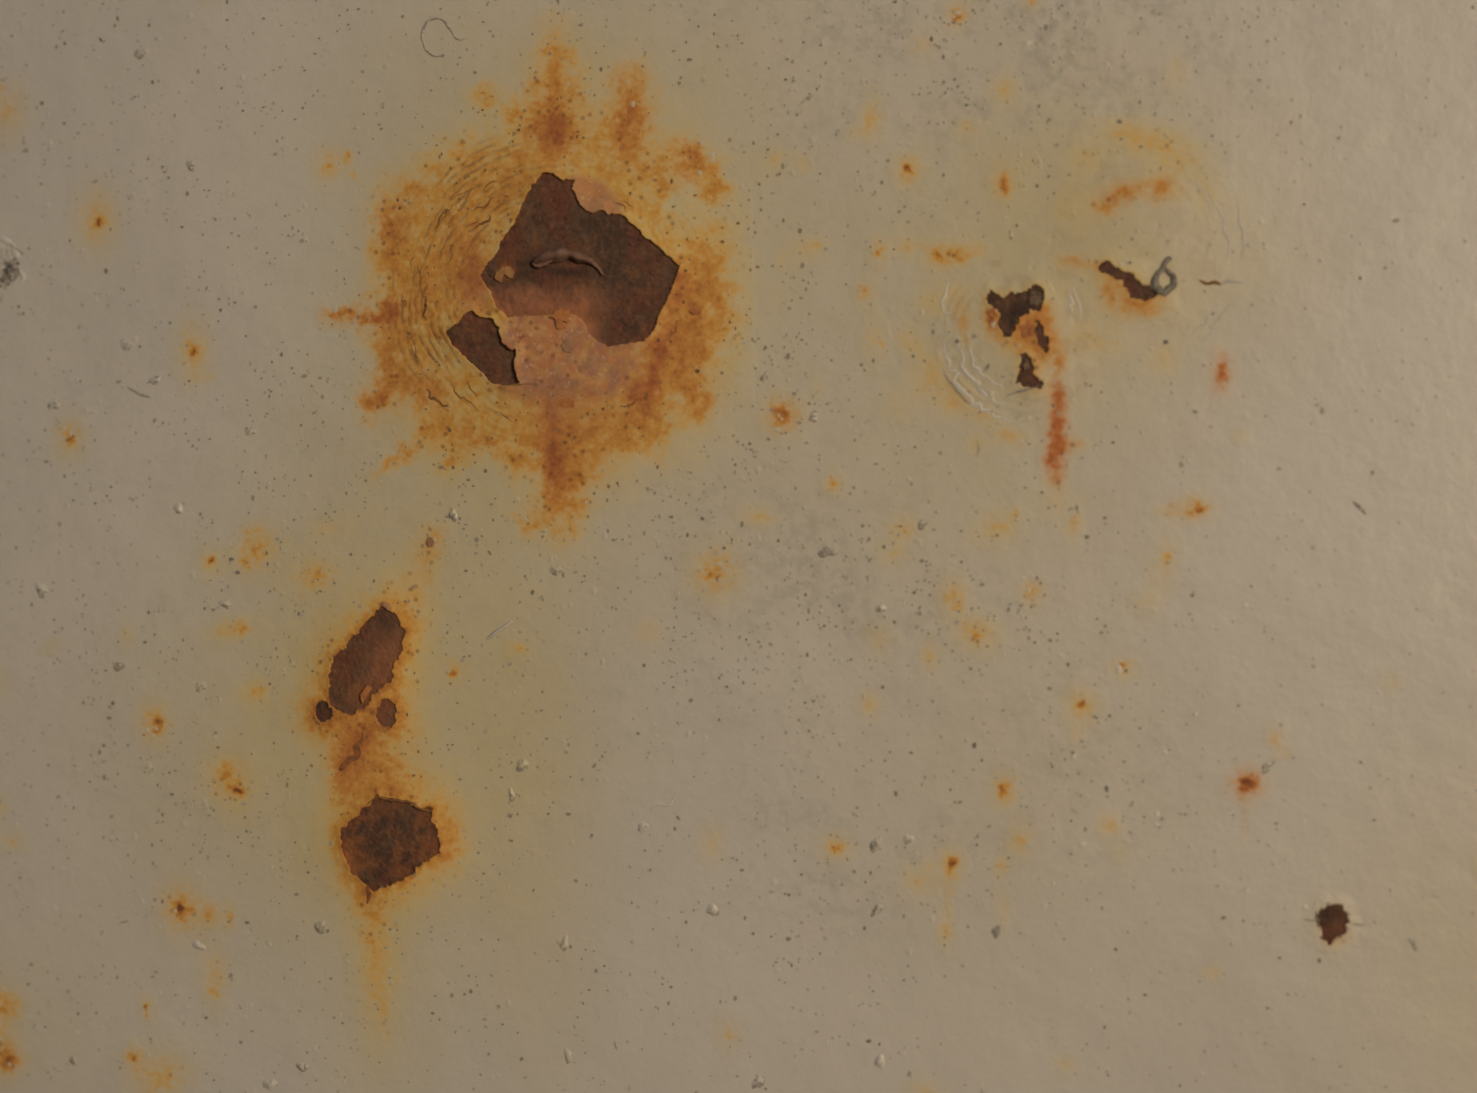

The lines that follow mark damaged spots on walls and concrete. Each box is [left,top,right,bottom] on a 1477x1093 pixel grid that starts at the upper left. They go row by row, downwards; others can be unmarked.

corrosion [127,4,837,1085]